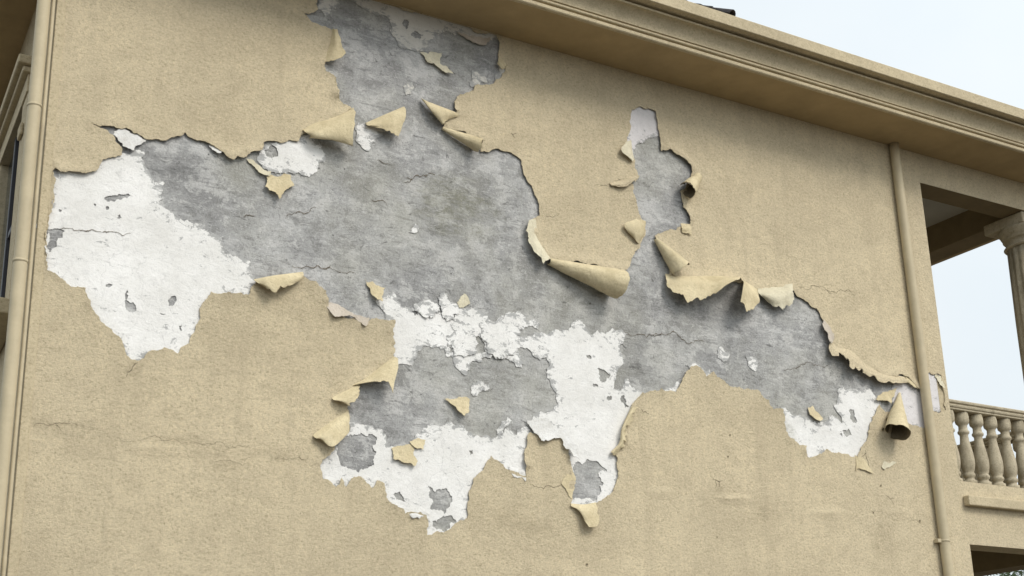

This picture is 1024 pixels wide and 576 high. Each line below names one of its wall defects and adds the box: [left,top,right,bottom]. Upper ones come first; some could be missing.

peeling [45,0,925,535]